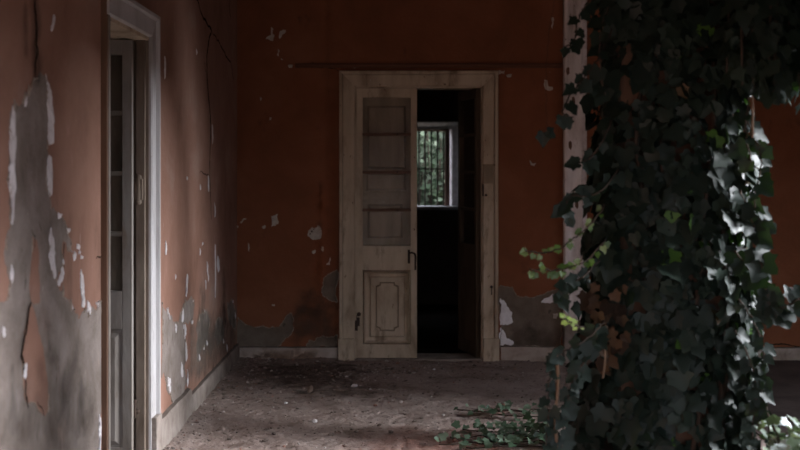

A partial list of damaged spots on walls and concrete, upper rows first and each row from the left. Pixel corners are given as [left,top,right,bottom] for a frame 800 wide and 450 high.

crack [33,0,41,78]
crack [197,0,234,197]
peeling [0,72,102,450]
flaking render [205,245,220,298]
flaking render [307,226,324,254]
peeling [161,274,228,403]
peeling [498,285,563,347]